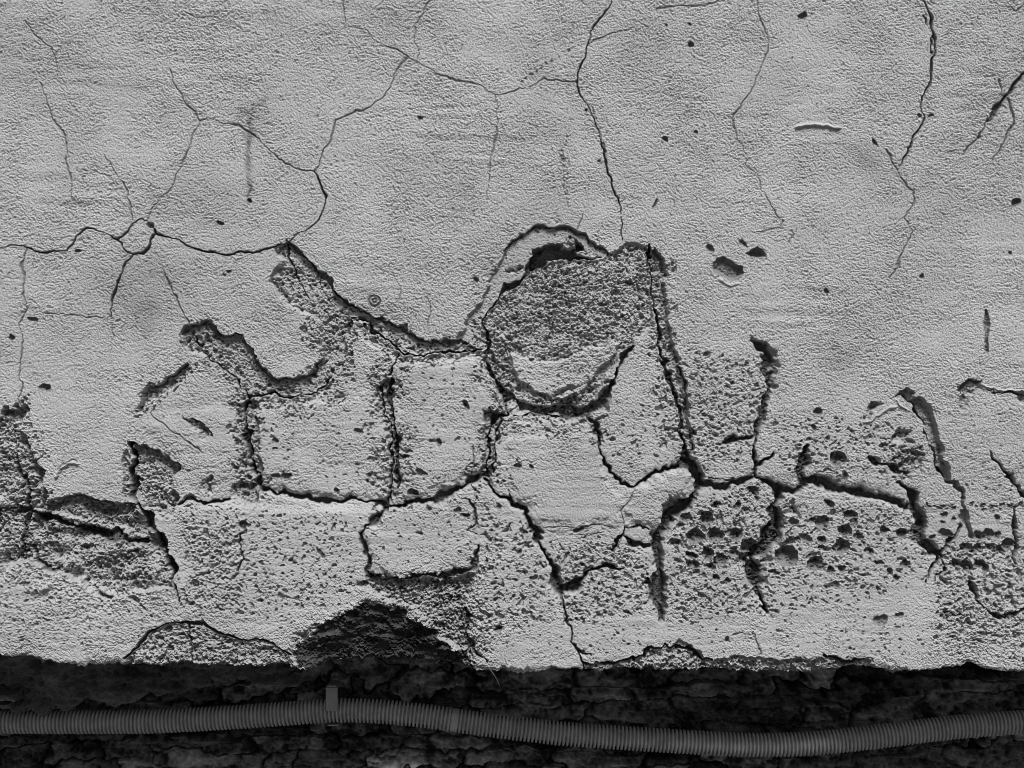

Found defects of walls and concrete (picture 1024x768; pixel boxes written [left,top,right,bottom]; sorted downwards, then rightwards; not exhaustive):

crack [0,0,630,407]
crack [731,0,795,244]
crack [885,0,937,280]
crack [962,71,1024,162]
flaking render [135,224,697,513]
flaking render [0,403,182,612]
crack [127,441,249,606]
flaking render [353,544,489,664]
crack [234,336,1024,669]
flaking render [665,486,767,592]
flaking render [581,638,877,672]
flaking render [922,501,1024,581]